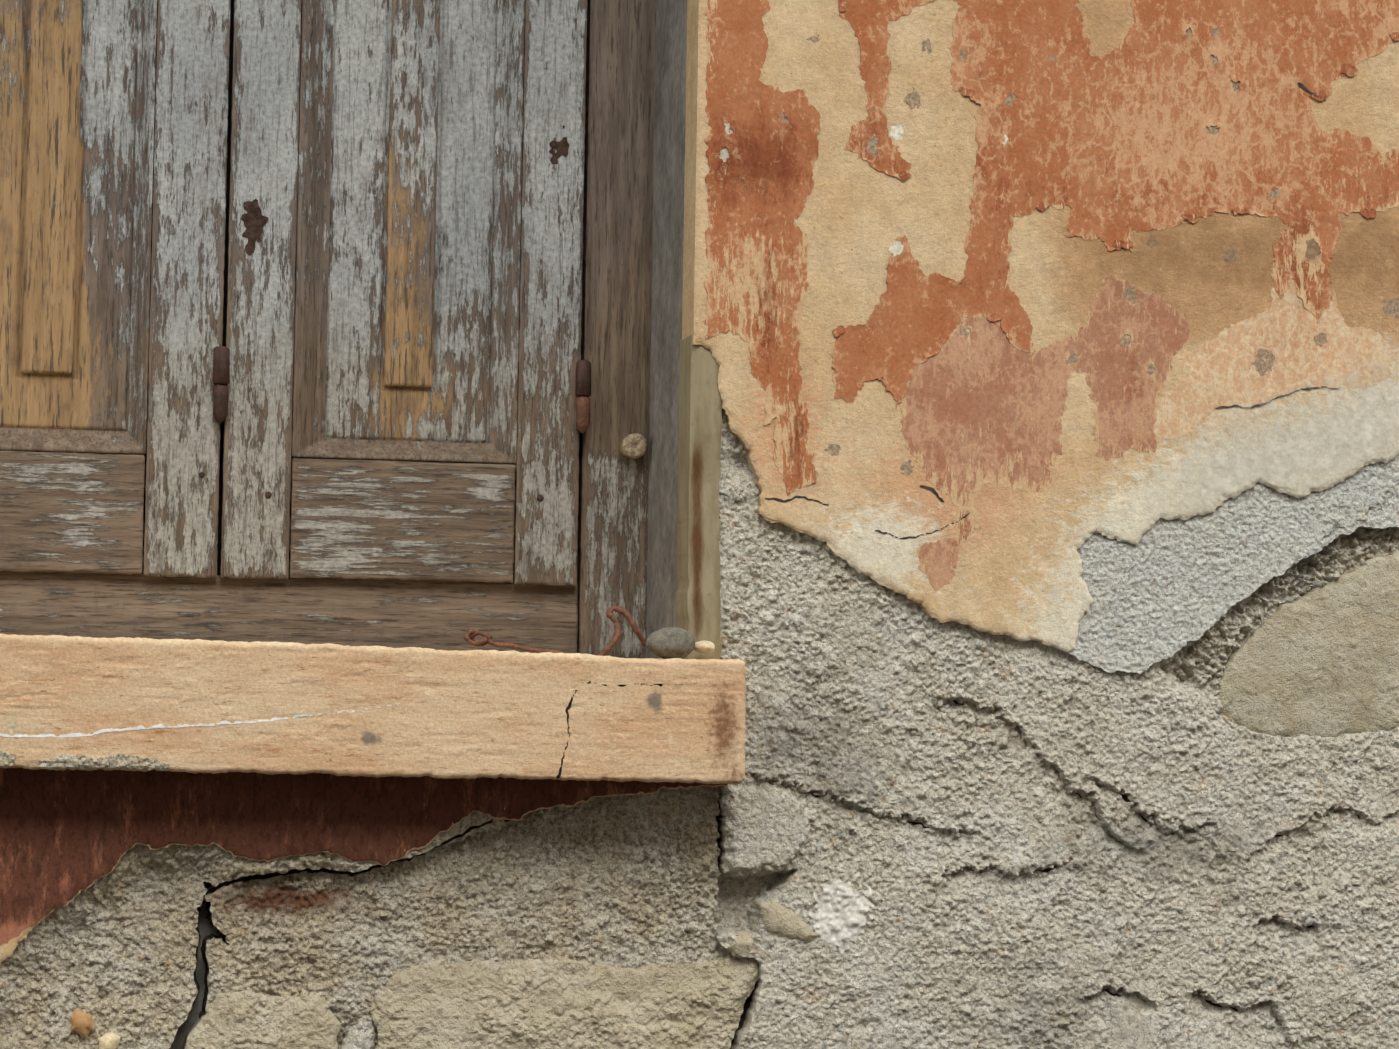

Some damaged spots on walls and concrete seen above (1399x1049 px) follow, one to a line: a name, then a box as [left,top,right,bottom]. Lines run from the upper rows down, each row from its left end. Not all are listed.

spalling [695,0,1399,1049]
crack [556,681,686,779]
crack [865,810,930,829]
crack [1052,765,1174,845]
crack [177,821,489,1031]
spalling [0,786,761,1049]
crack [1019,866,1058,876]
crack [1200,996,1238,1012]